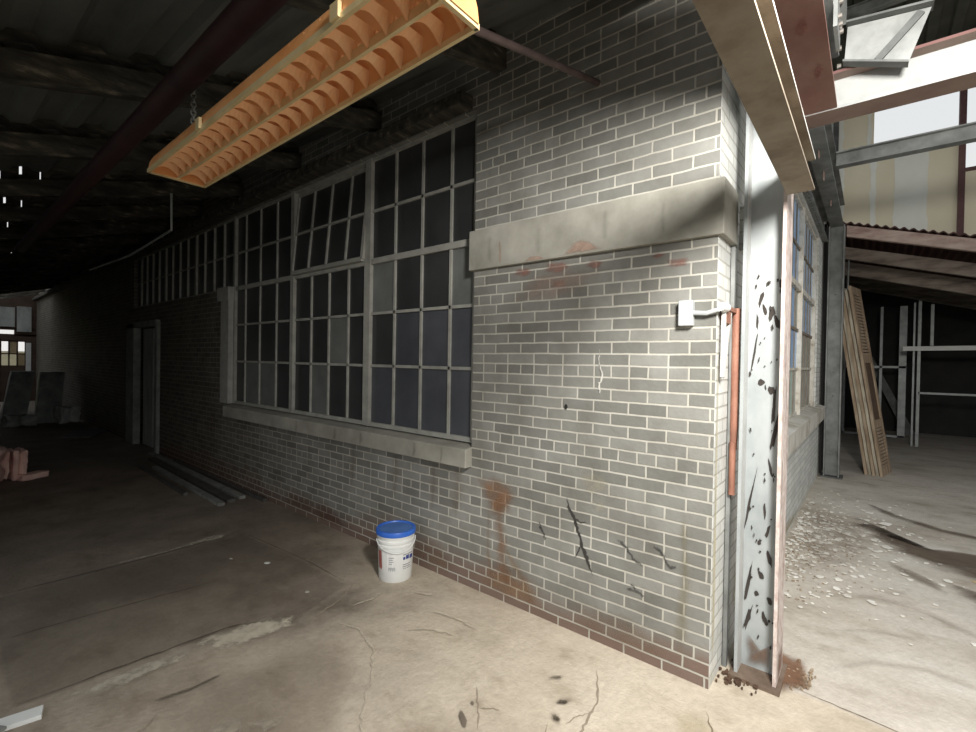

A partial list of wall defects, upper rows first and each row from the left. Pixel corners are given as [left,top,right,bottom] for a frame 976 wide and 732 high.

peeling [743,274,782,630]
crack [567,501,593,575]
crack [618,540,676,597]
corrosion [750,639,767,663]
corrosion [778,649,804,687]
crack [476,687,498,727]
crack [545,671,599,732]